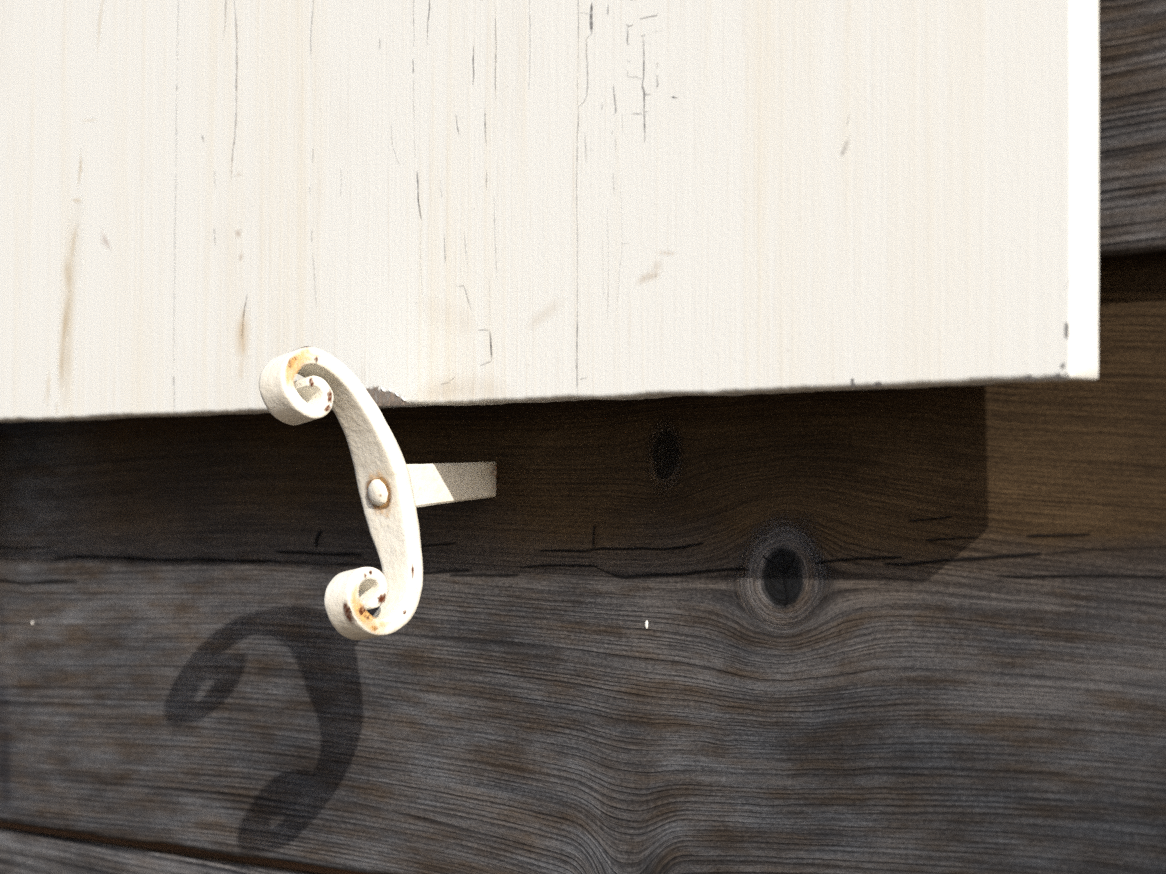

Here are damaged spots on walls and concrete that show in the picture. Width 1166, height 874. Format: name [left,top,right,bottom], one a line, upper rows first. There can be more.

peeling [366,386,411,406]
crack [421,516,1166,607]